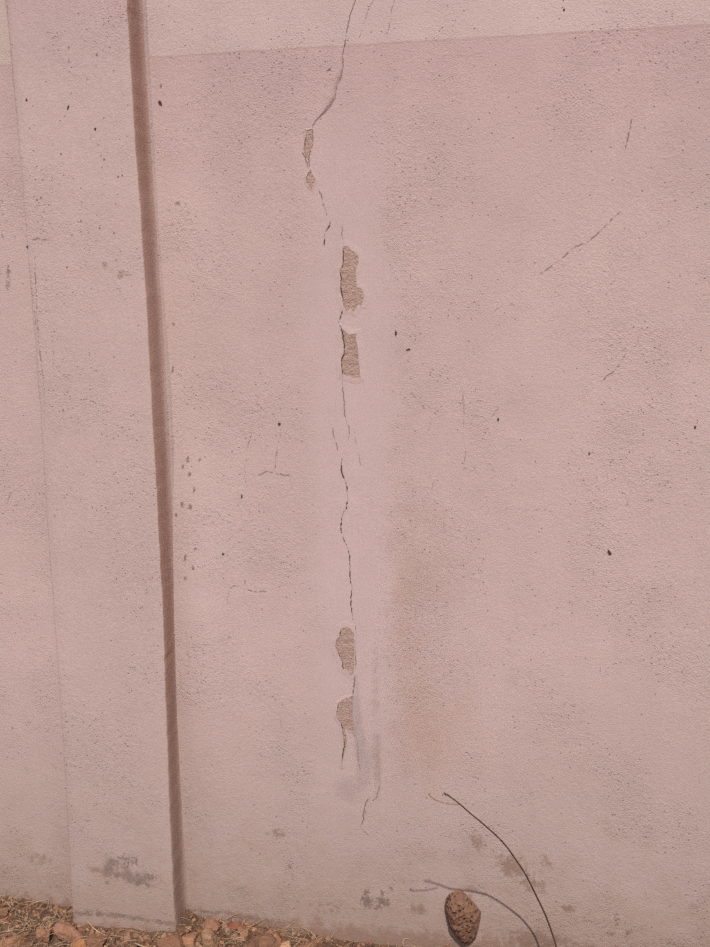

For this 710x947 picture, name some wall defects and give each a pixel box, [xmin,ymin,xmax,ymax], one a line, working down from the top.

crack [303,0,356,166]
peeling [301,128,318,192]
peeling [333,239,371,384]
crack [333,387,356,629]
peeling [329,620,361,770]